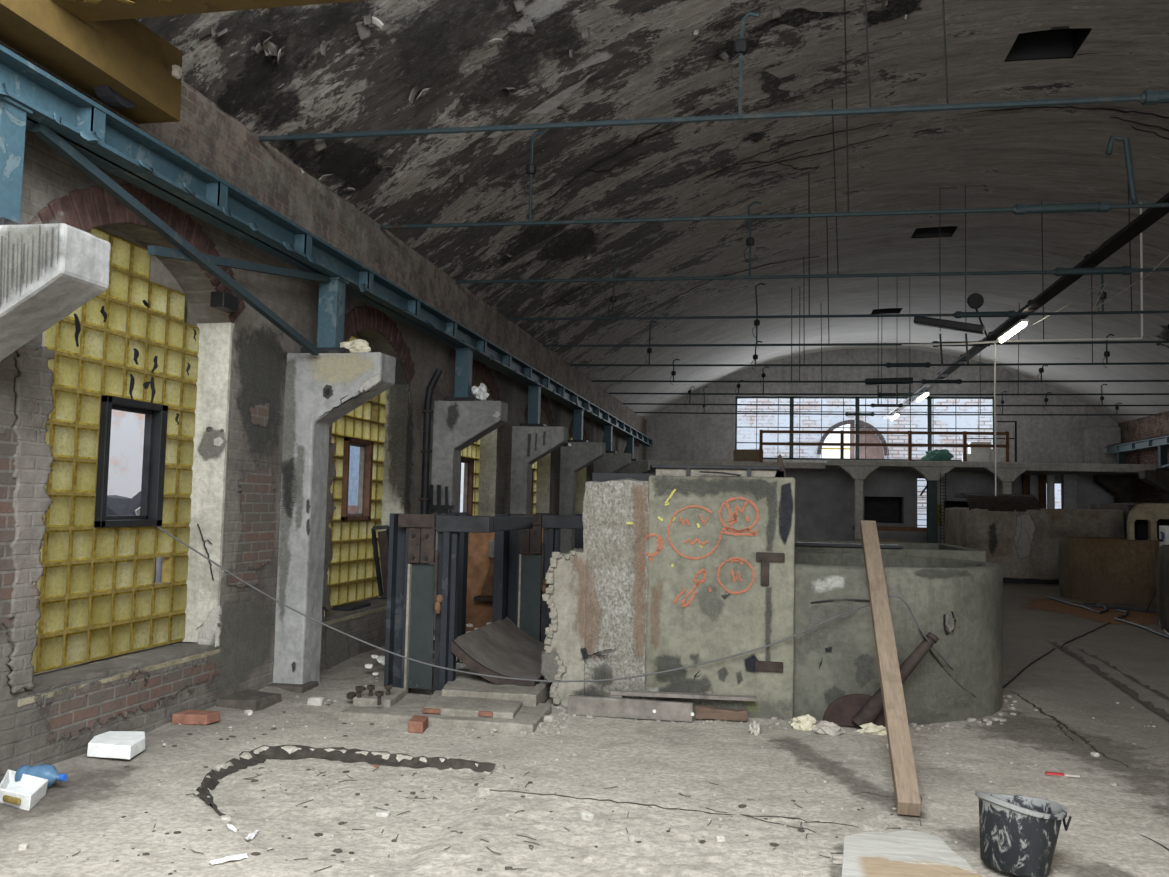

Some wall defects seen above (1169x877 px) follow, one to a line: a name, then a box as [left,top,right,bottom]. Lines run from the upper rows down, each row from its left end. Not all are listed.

crack [547,108,710,201]
crack [694,122,891,184]
crack [940,106,1169,140]
spalling [0,345,226,744]
spalling [541,648,563,681]
crack [1011,692,1128,767]